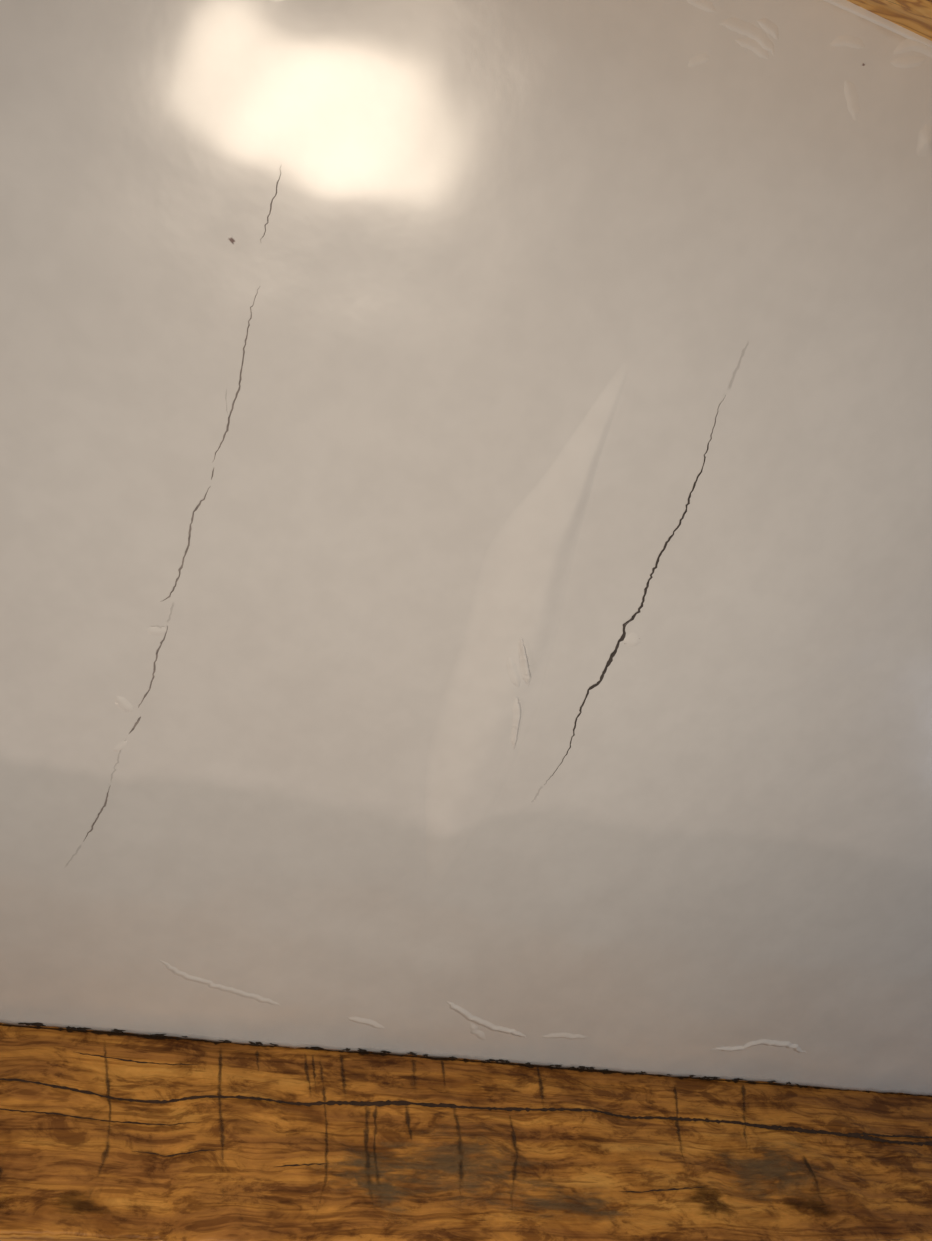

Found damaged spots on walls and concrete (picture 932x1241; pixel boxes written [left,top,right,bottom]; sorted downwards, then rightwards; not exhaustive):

crack [260,167,281,240]
crack [113,288,259,752]
crack [546,395,726,782]
crack [85,785,111,839]